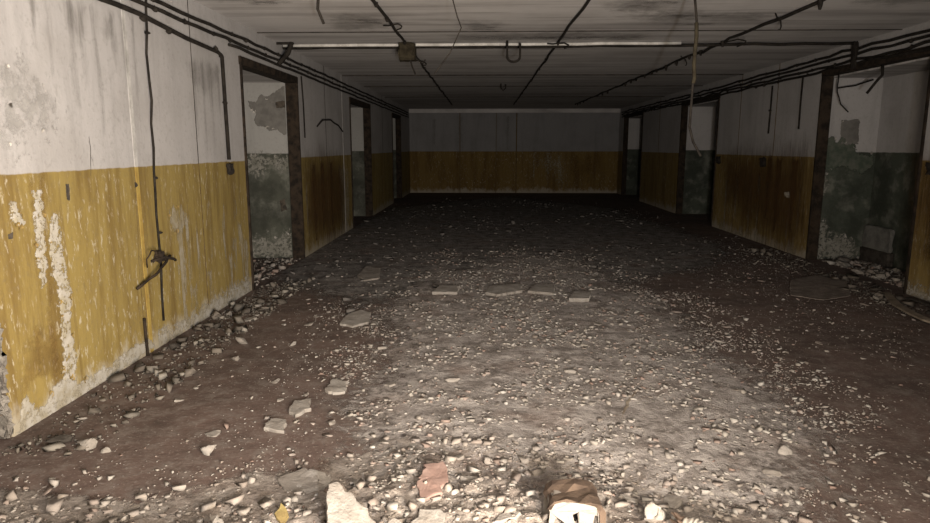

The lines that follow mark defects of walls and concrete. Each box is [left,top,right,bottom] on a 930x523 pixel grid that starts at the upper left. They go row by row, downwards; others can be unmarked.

peeling [248,86,287,135]
peeling [8,189,77,383]
spalling [0,323,16,439]